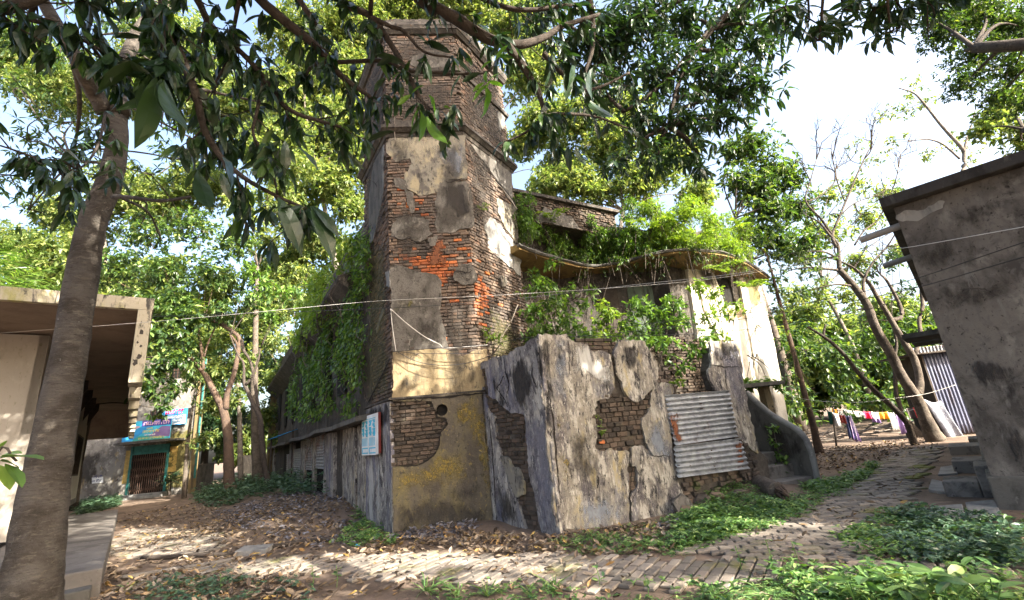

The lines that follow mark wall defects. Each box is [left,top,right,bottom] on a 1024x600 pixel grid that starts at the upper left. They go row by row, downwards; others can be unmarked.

flaking render [369,135,522,276]
flaking render [376,263,541,531]
spalling [592,368,671,491]
corrosion [671,413,682,441]